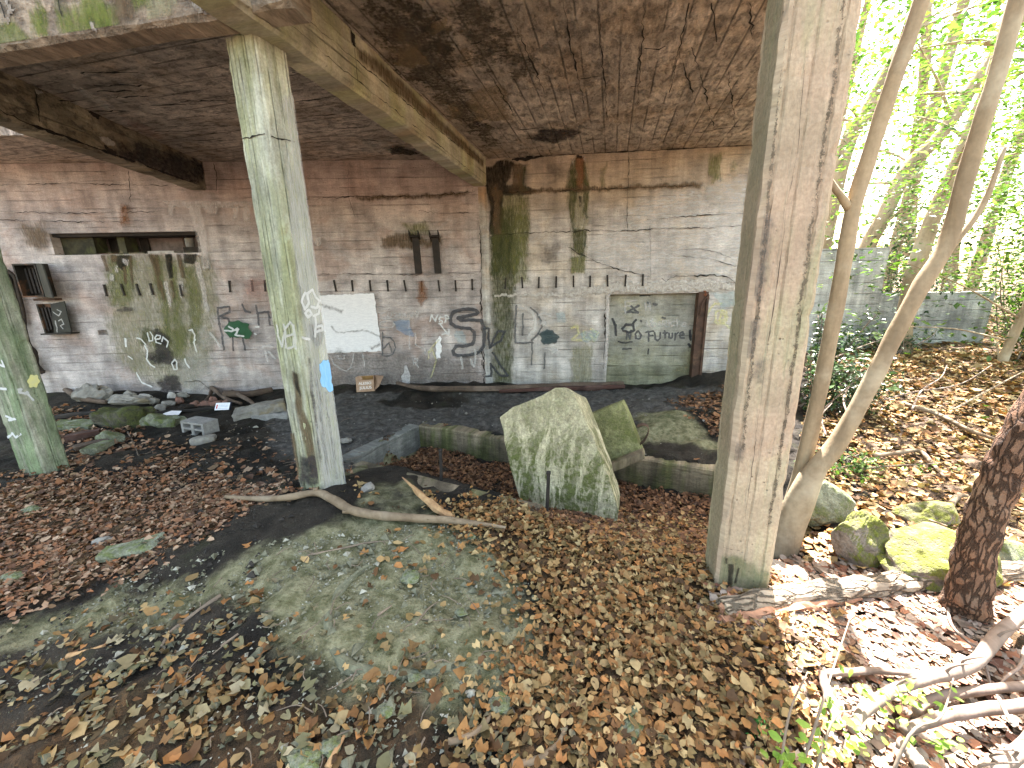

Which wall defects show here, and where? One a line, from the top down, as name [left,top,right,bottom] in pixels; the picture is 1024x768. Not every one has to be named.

crack [747,3,755,35]
crack [1,71,380,223]
leakage [359,0,534,384]
crack [294,3,748,384]
leakage [532,129,581,144]
leakage [568,158,589,273]
leakage [101,254,216,387]